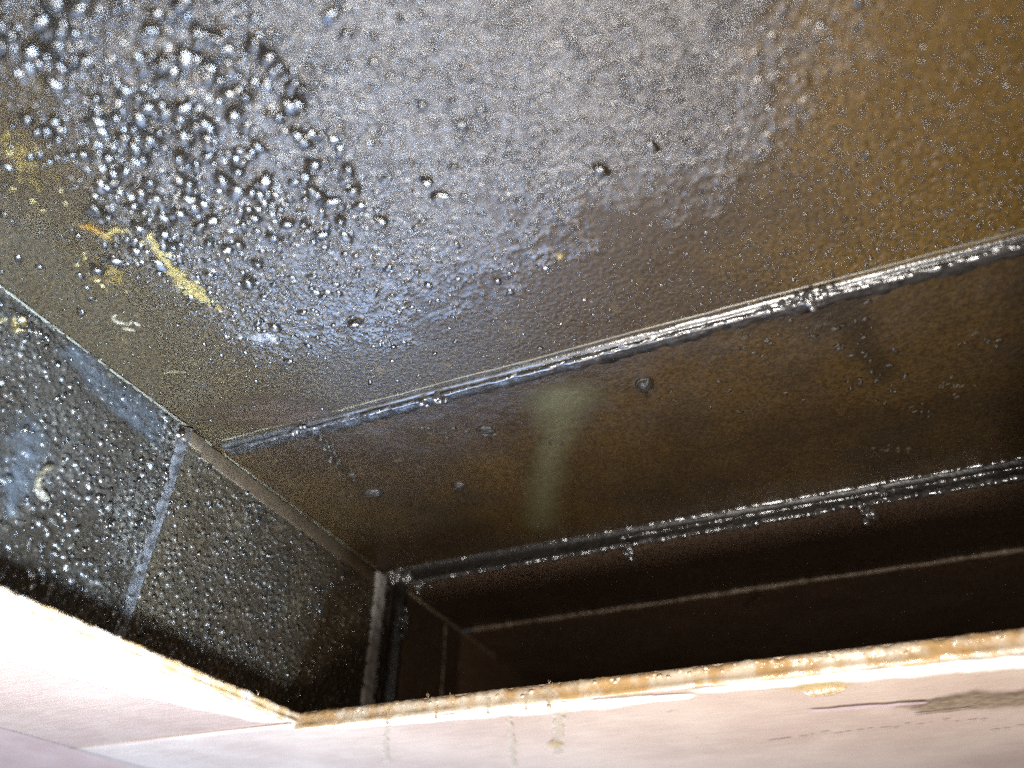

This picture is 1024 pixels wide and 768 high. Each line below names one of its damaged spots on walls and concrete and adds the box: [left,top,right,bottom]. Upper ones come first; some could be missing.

corrosion [812,692,1024,715]